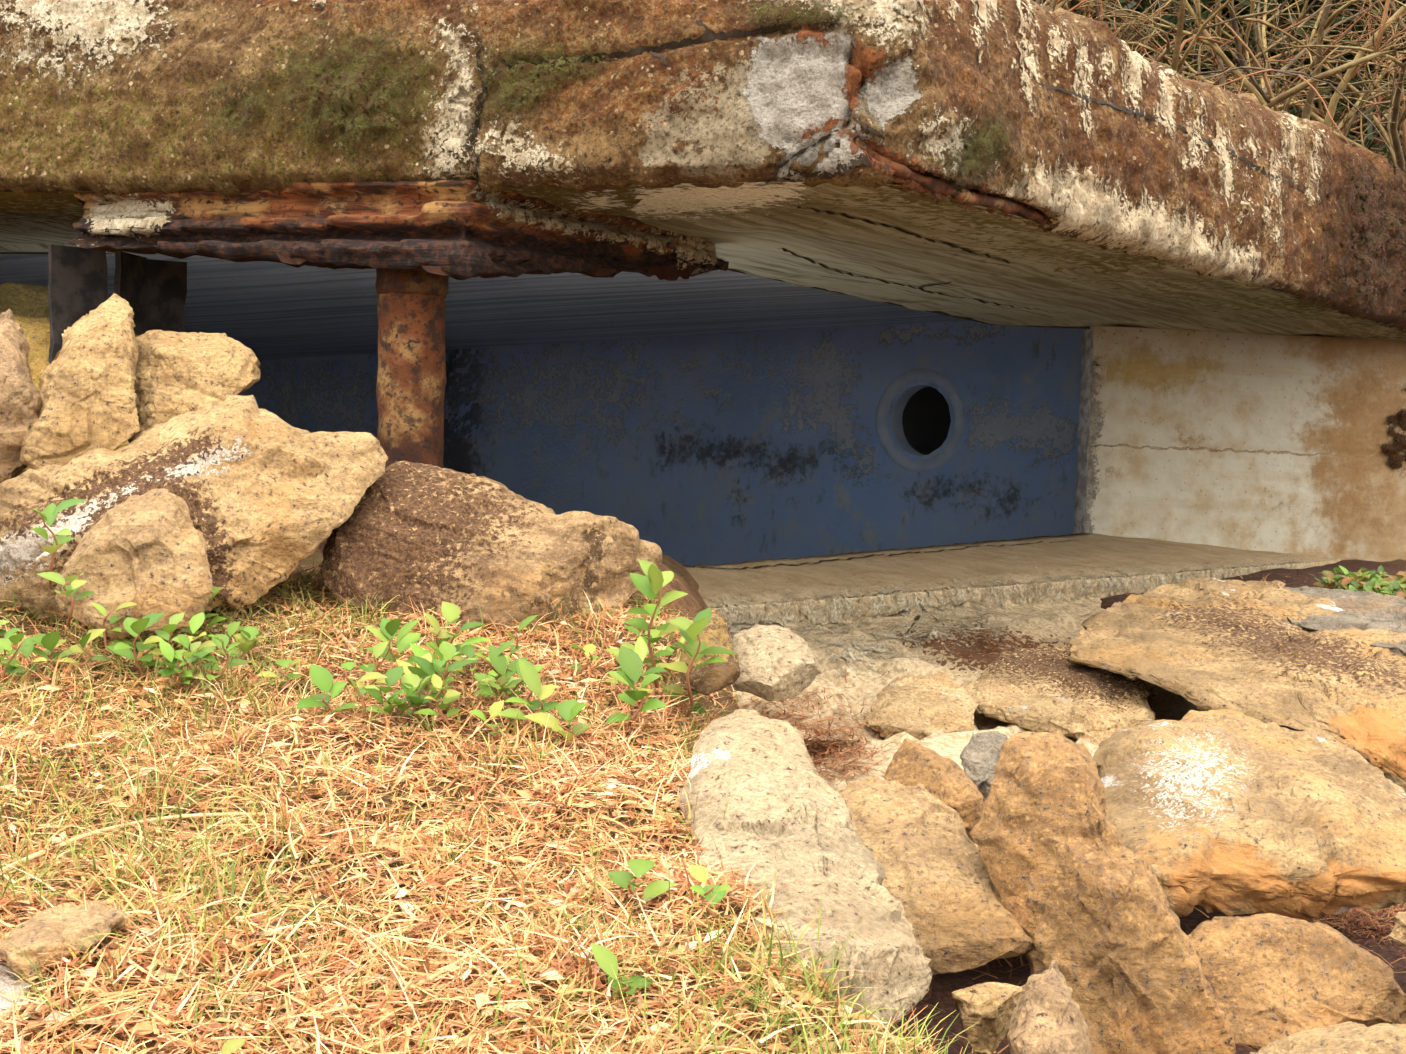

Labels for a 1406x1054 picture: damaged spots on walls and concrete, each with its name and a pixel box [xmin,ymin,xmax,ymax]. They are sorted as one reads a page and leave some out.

water stain [0,0,212,103]
water stain [406,0,823,275]
crack [455,20,1012,264]
spalling [741,20,1060,229]
corrosion [422,266,456,276]
crack [780,248,1058,313]
water stain [656,433,861,500]